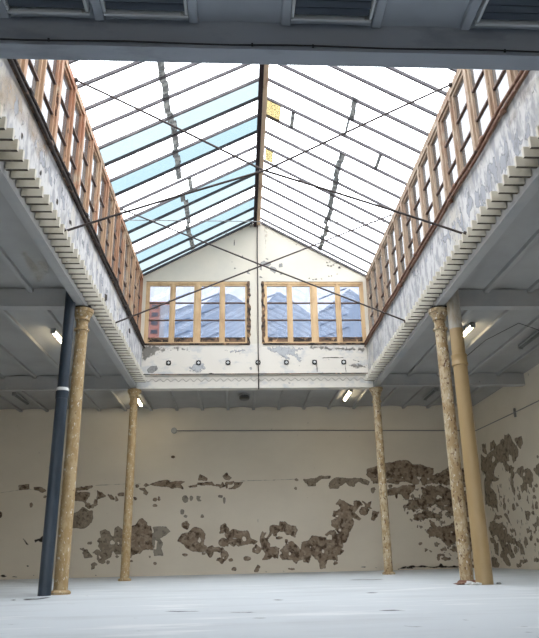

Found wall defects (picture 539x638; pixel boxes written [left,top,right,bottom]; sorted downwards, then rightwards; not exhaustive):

peeling [73,485,124,529]
spalling [80,526,123,570]
spalling [130,473,379,572]
peeling [294,466,378,493]
peeling [385,460,458,561]
peeling [462,468,474,568]
peeling [481,434,539,568]